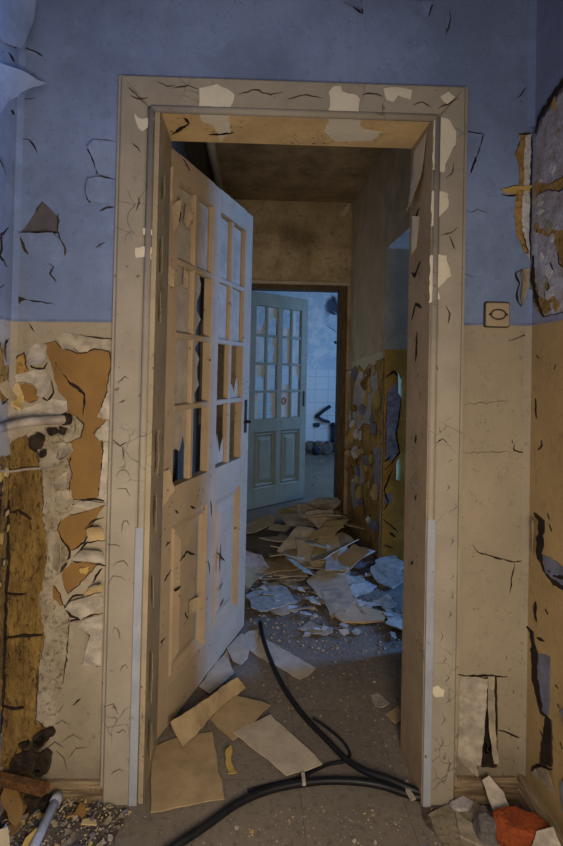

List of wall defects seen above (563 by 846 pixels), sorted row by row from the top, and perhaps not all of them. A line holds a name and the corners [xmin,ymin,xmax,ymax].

peeling [0,0,46,115]
crack [23,139,37,155]
peeling [157,81,281,141]
peeling [289,86,459,256]
spalling [502,78,563,317]
peeling [411,254,451,323]
spalling [344,334,418,565]
crack [464,439,543,454]
spalling [0,333,130,778]
crack [533,601,548,622]
peeling [433,674,519,777]
peeling [526,626,563,812]